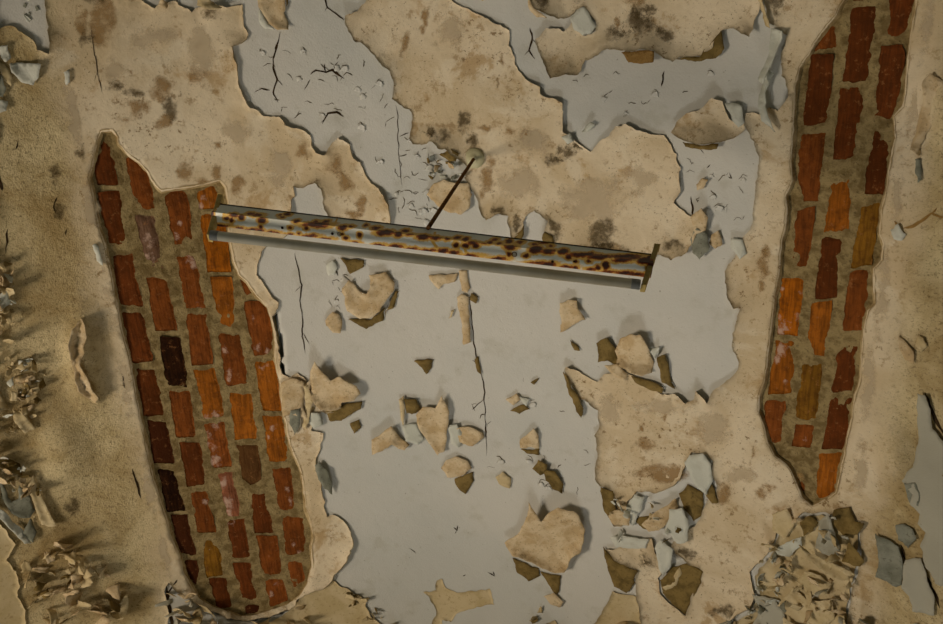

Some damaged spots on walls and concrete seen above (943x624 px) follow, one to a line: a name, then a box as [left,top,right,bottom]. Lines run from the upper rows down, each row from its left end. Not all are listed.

water stain [609,0,672,41]
crack [255,34,442,226]
peeling [0,0,399,624]
crack [295,257,309,350]
crack [469,295,561,490]
peeling [345,0,943,624]